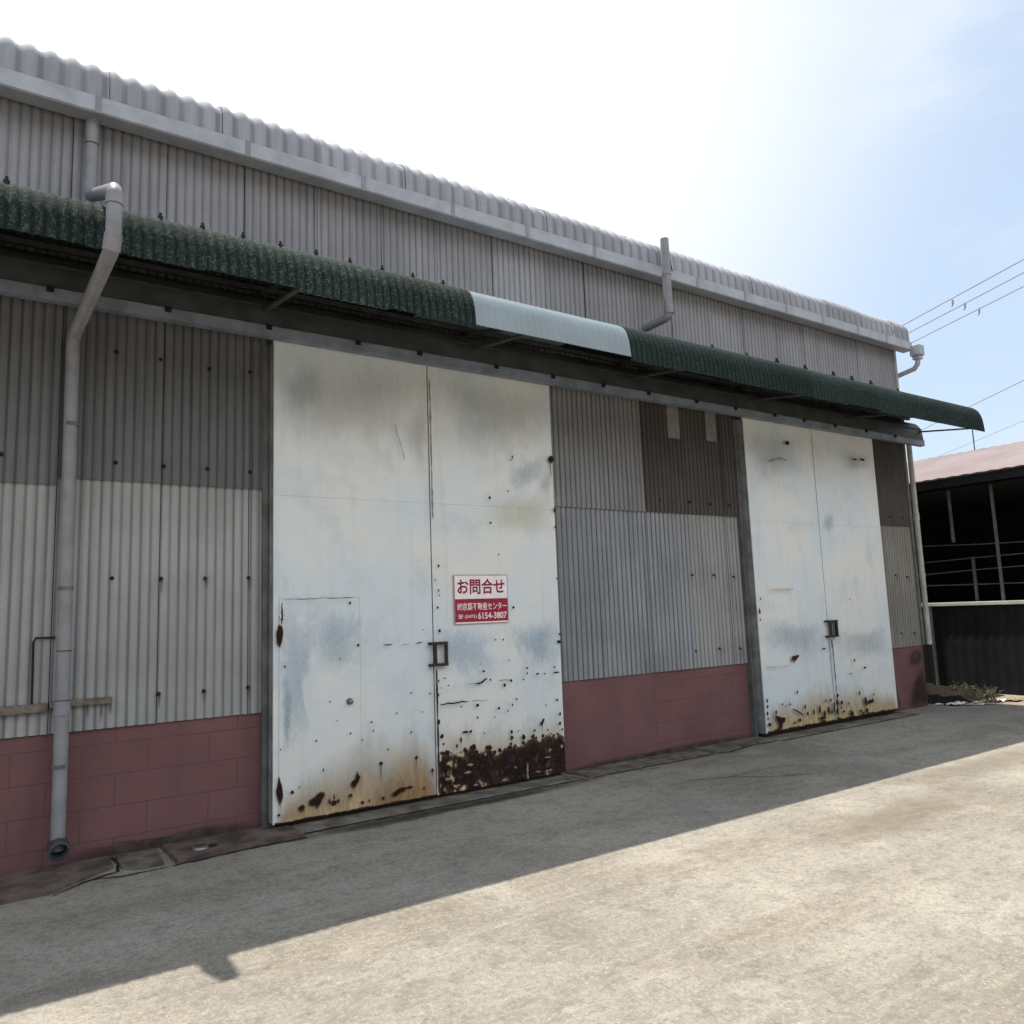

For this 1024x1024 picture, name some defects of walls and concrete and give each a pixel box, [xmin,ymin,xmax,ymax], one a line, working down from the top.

rust [276,597,354,648]
rust [766,640,899,734]
rust [275,668,566,825]